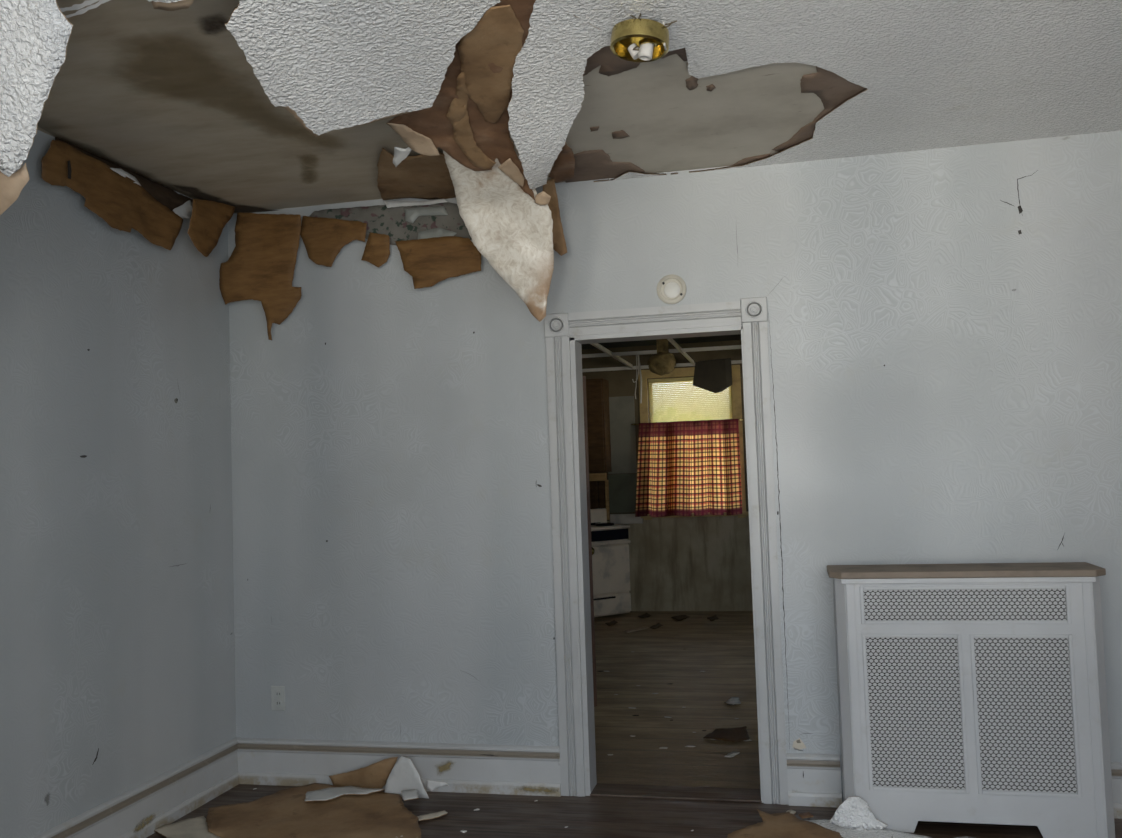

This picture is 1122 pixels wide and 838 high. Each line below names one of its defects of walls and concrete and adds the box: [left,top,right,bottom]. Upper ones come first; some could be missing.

flaking render [37,0,481,340]
peeling [547,46,867,183]
crack [1002,170,1038,234]